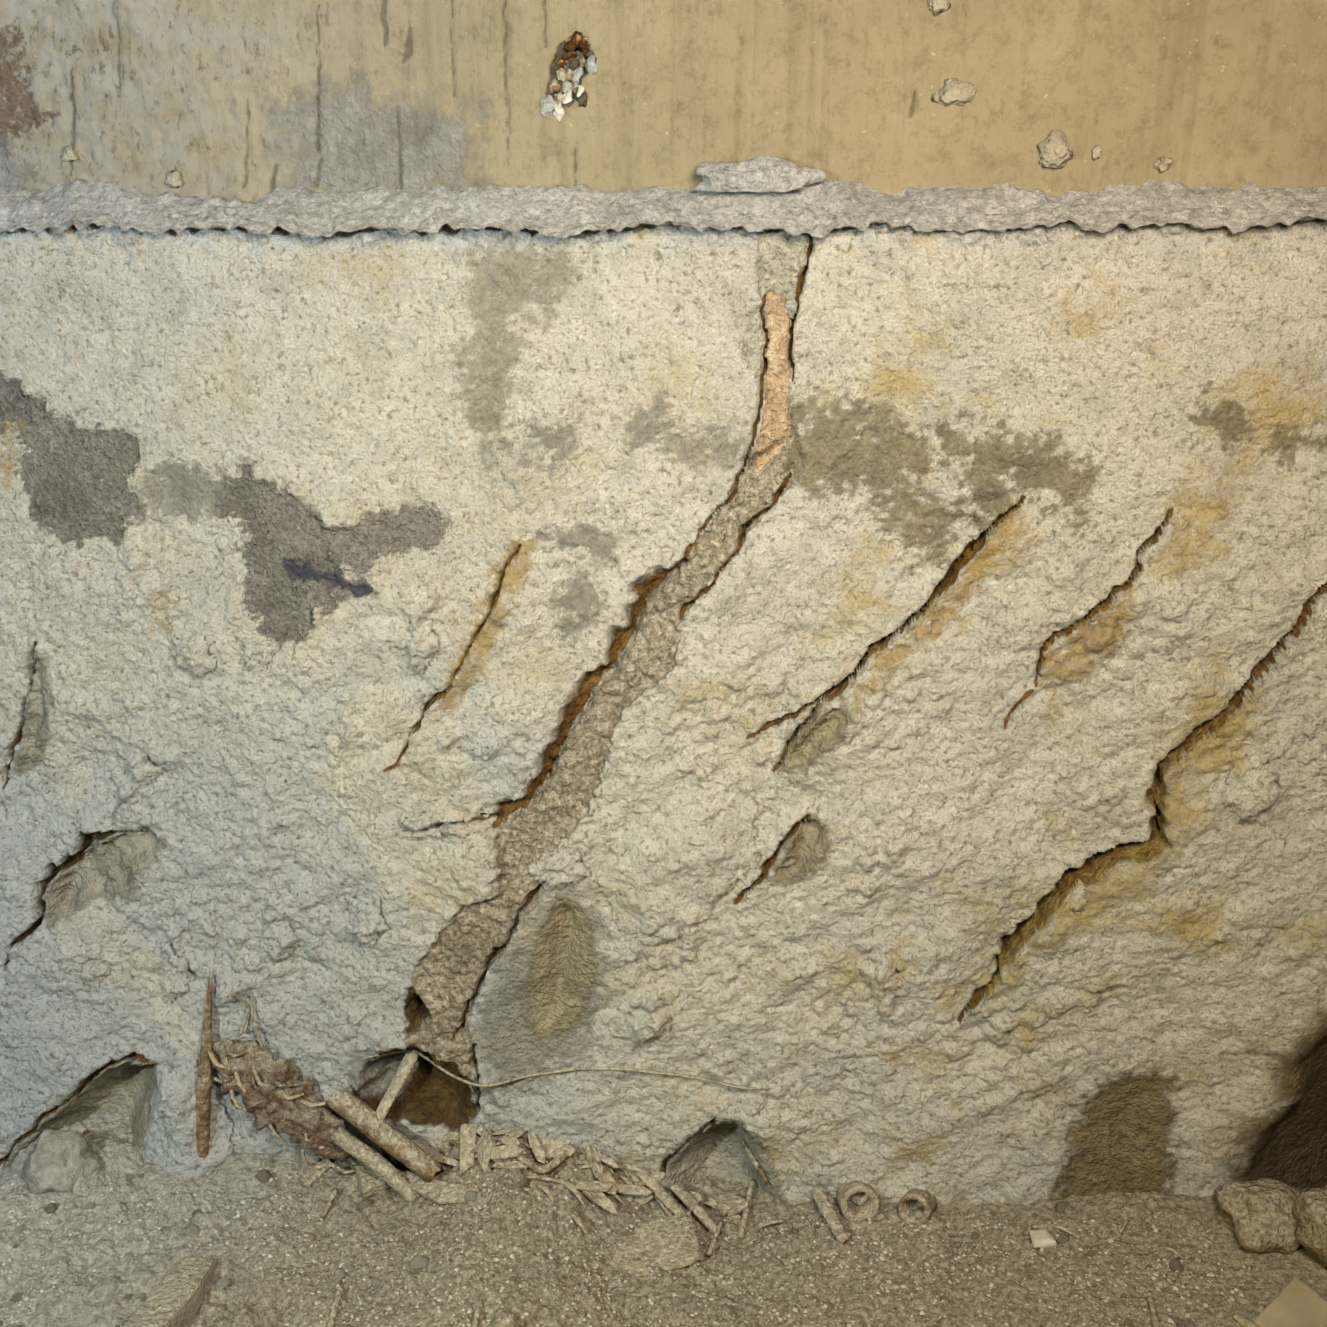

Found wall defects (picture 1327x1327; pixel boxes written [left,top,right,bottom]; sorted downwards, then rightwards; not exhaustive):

leakage [0,26,56,192]
leakage [783,376,1102,574]
spalling [2,641,53,789]
crack [351,229,813,1131]
crack [746,495,1026,772]
crack [1004,508,1173,729]
spalling [4,827,165,968]
spalling [733,814,830,905]
crack [957,583,1327,1024]
spalling [0,1052,153,1165]
spalling [1230,1012,1327,1188]